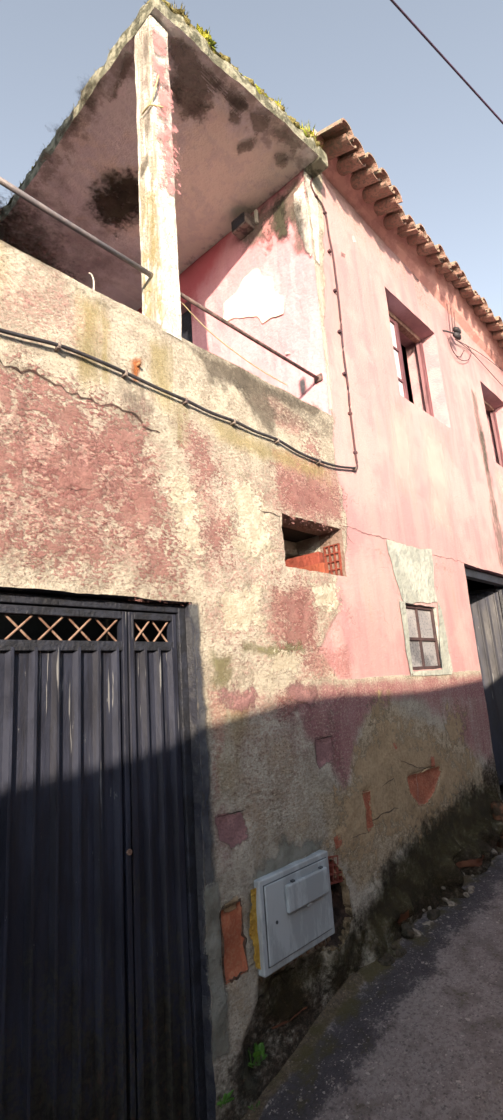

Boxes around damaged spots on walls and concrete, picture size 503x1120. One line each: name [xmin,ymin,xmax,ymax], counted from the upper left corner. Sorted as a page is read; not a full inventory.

water stain [90,153,148,237]
spalling [151,26,301,195]
flaking render [223,268,284,323]
water stain [243,177,308,254]
spalling [294,171,320,264]
peeling [0,349,347,723]
peeling [386,539,453,677]
water stain [472,393,503,563]
spalling [219,690,479,1029]
water stain [328,778,503,988]